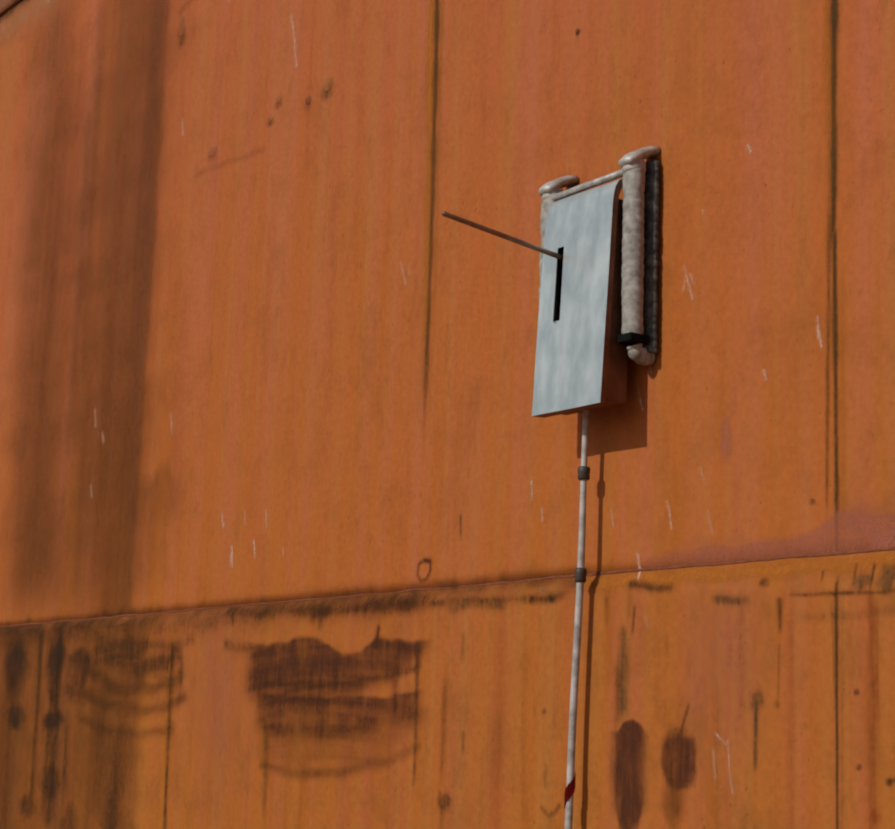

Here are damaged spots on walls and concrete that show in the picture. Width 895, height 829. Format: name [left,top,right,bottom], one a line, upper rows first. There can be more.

rust [584,553,895,589]